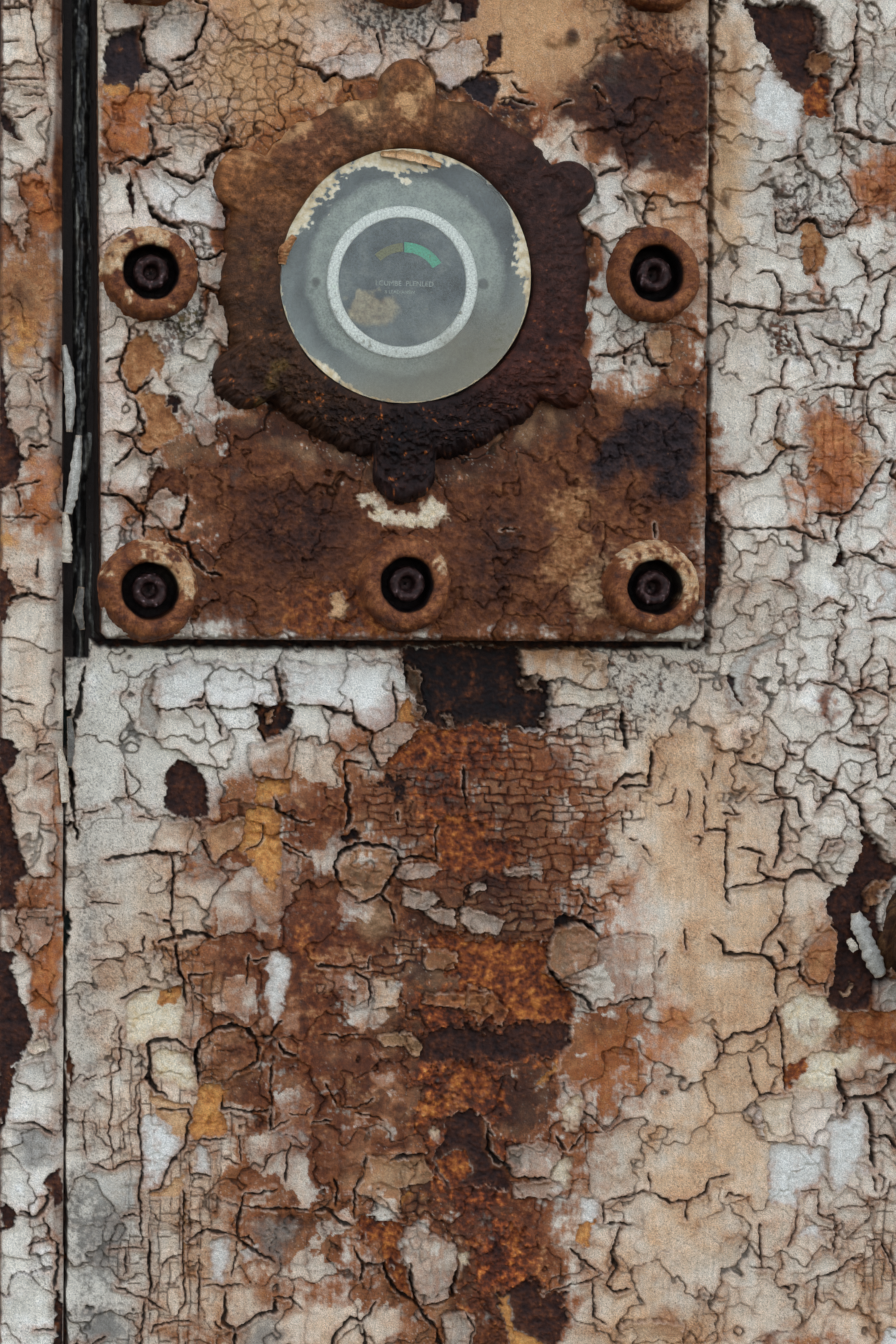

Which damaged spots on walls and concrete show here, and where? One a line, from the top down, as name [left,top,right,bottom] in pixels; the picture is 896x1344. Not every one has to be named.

crack [108,0,250,298]
rust [455,0,709,195]
peeling [718,0,896,188]
rust [180,382,707,641]
crack [539,0,896,1105]
rust [774,392,896,557]
peeling [111,640,624,864]
peeling [0,698,85,1153]
crack [0,657,481,1344]
rust [180,751,457,1202]
peeling [344,796,658,1344]
crack [535,1059,896,1344]